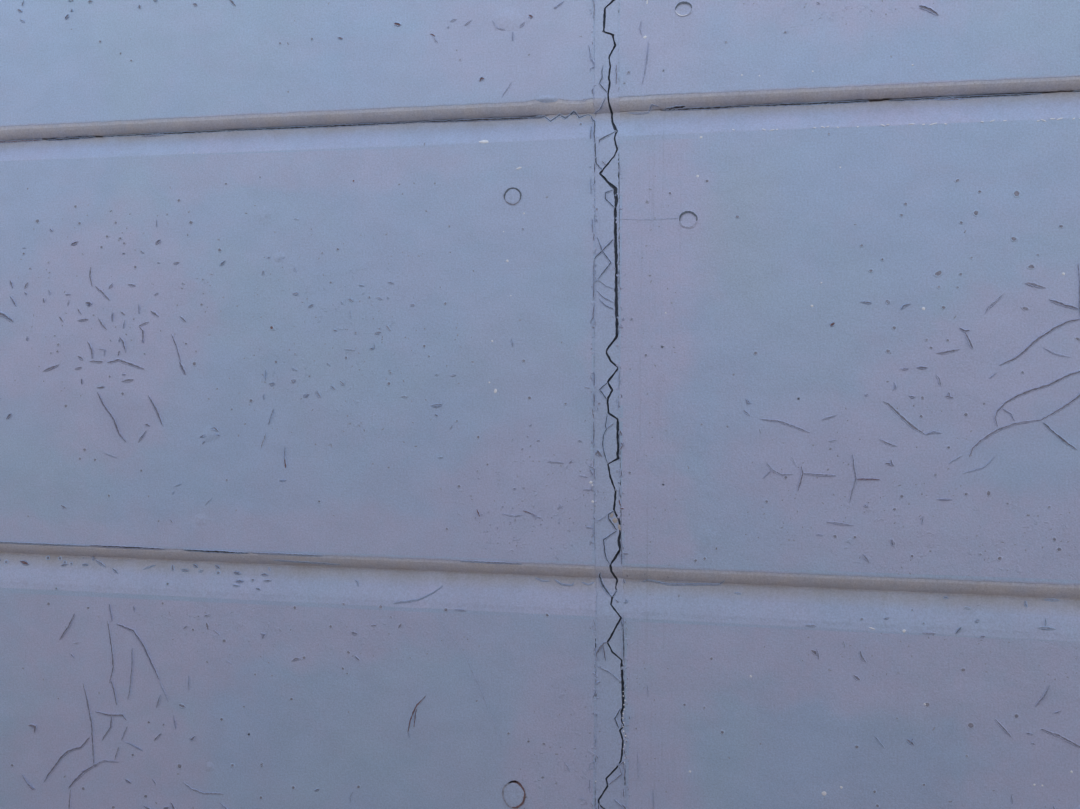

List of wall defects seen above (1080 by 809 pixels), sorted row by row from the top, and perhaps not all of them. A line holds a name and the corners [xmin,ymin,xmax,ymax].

crack [675,1,692,16]
crack [639,0,649,84]
crack [629,100,869,115]
crack [889,93,1042,102]
crack [679,211,698,228]
crack [999,263,1080,366]
crack [959,328,974,349]
crack [0,0,633,809]
crack [760,419,810,433]
crack [883,401,941,435]
crack [949,370,1080,473]
crack [763,454,894,503]